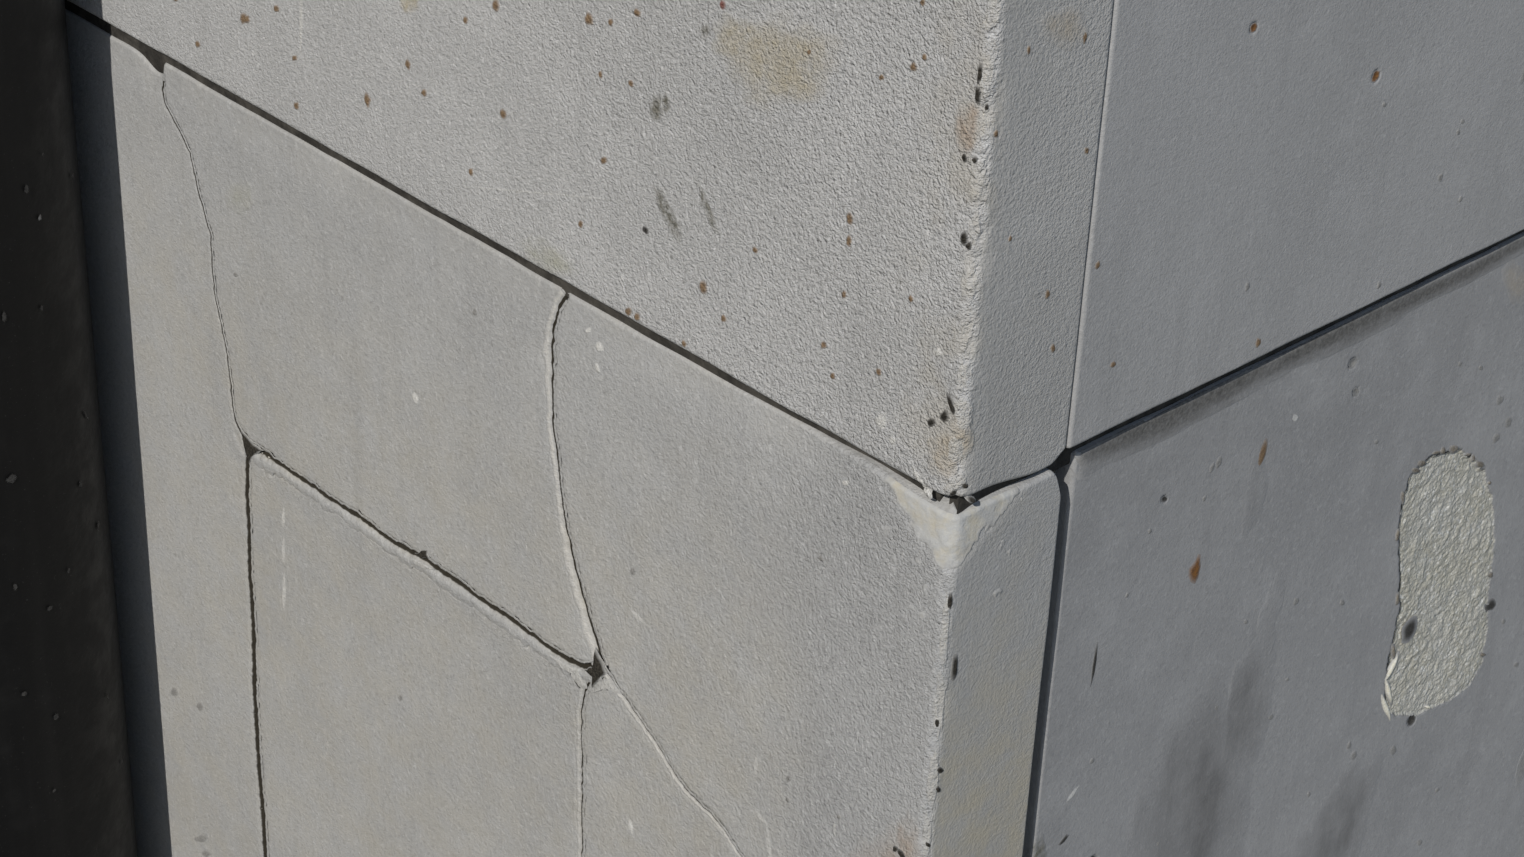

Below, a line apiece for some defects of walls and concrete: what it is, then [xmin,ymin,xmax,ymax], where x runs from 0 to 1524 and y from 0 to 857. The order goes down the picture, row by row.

crack [161,80,744,857]
peeling [1381,445,1506,727]